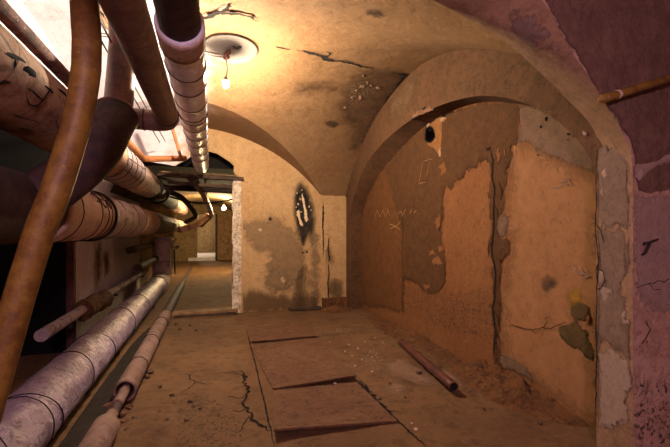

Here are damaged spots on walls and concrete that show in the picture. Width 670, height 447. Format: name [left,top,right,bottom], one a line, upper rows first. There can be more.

crack [277,47,373,70]
leakage [243,218,320,312]
crack [322,206,330,298]
flaking render [362,0,670,447]
crack [486,147,566,363]
crack [219,333,275,446]